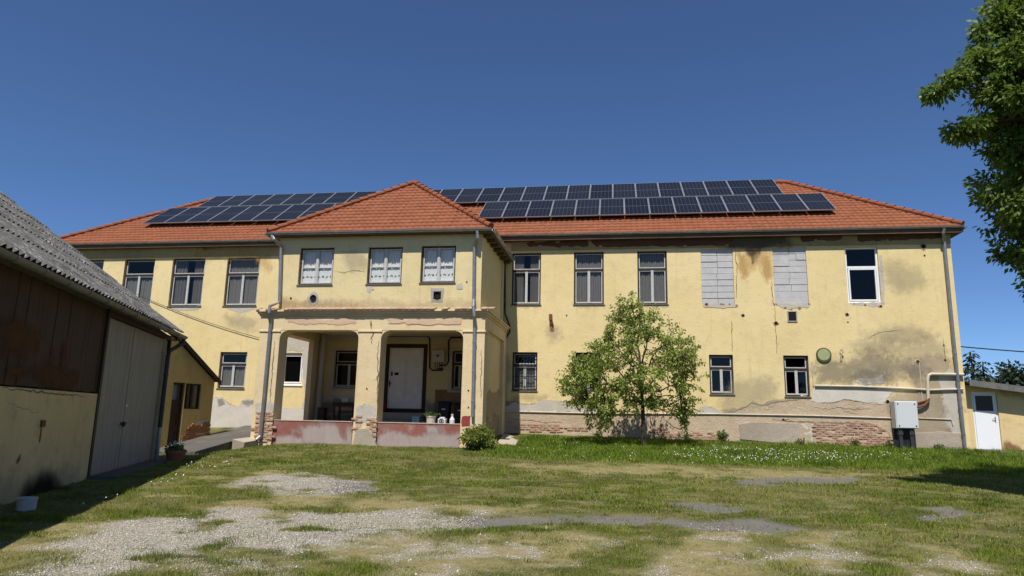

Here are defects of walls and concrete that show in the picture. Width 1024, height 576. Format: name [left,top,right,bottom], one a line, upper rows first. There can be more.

flaking render [181,337,309,442]
flaking render [323,401,377,441]
flaking render [486,359,961,447]
damp [821,355,951,413]